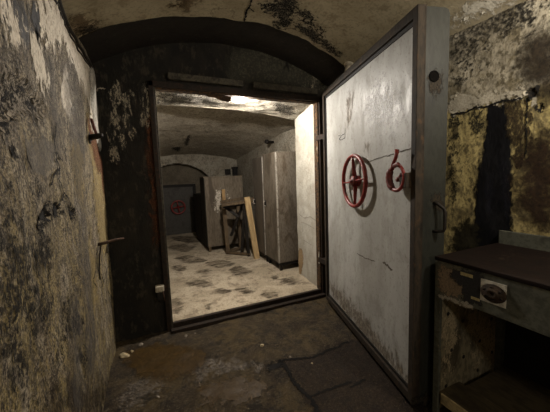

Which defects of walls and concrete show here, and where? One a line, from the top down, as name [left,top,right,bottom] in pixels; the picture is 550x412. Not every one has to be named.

leakage [0,0,40,47]
leakage [257,0,342,58]
peeling [0,0,110,320]
leakage [106,79,135,162]
crack [451,97,528,154]
peeling [448,85,545,117]
leakage [446,0,550,232]
leakage [0,181,84,391]
crack [280,340,366,412]